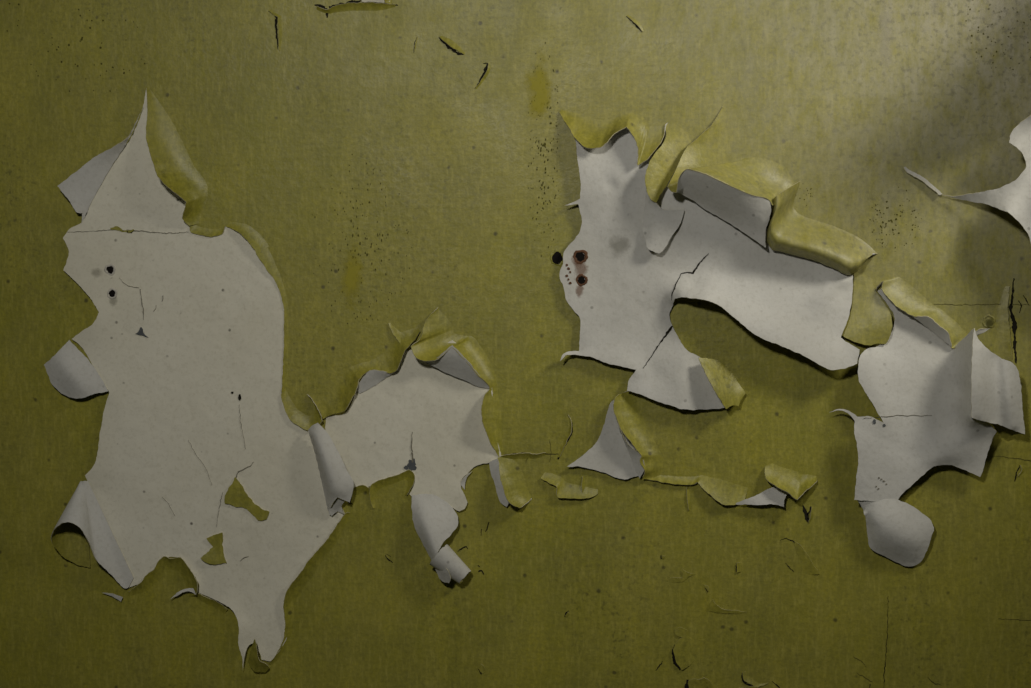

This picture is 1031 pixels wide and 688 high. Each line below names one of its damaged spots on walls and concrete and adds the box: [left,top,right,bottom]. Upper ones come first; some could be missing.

peeling [315,0,398,18]
peeling [44,87,546,672]
peeling [540,106,1031,567]
crack [934,278,1029,363]